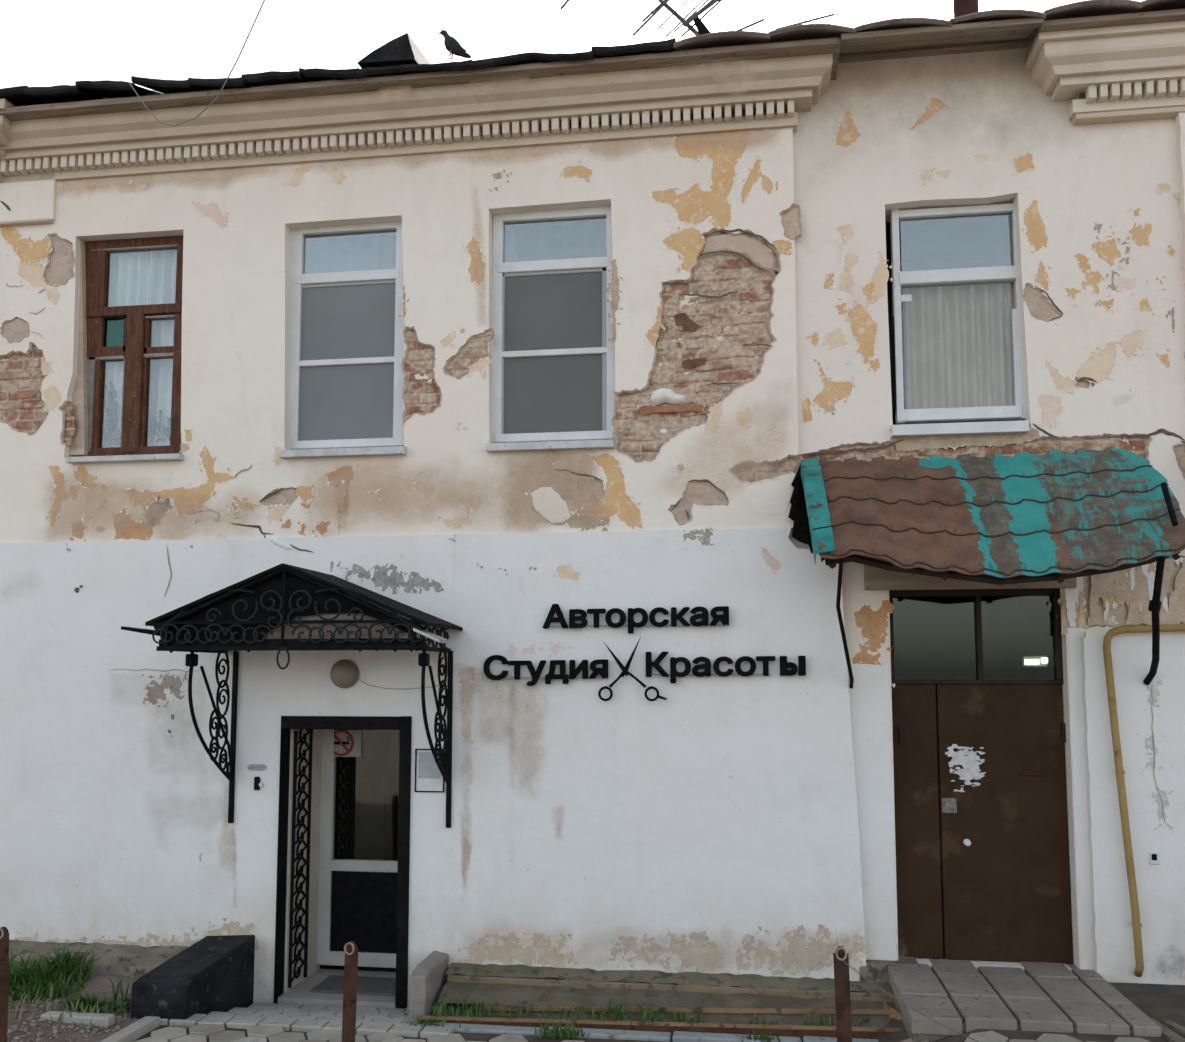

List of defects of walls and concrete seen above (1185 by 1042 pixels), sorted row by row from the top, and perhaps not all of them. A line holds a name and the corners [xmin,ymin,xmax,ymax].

flaking render [0,226,75,304]
flaking render [0,317,76,447]
flaking render [398,278,494,424]
flaking render [537,130,802,532]
peeling [802,223,893,422]
flaking render [729,329,1185,483]
flaking render [1022,200,1182,334]
peeling [64,427,237,553]
crack [192,489,314,553]
peeling [330,561,444,594]
flaking render [668,463,729,546]
flaking render [1058,555,1185,635]